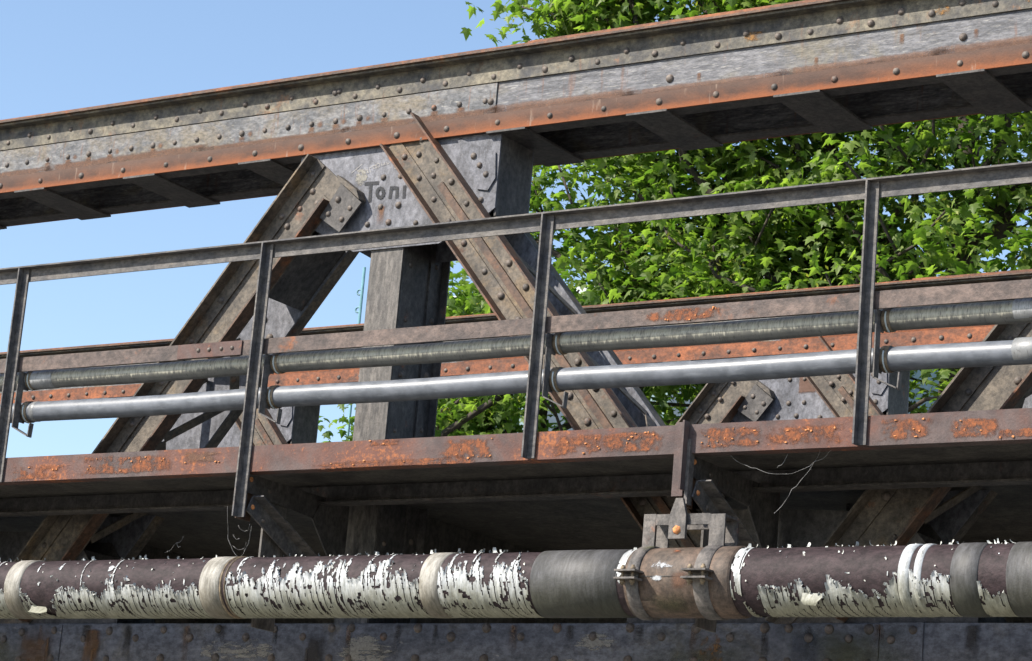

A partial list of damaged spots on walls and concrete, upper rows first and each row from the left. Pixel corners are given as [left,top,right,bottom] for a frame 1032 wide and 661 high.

rust [0,29,1032,194]
rust [555,431,661,456]
rust [701,424,840,448]
rust [882,418,929,440]
rust [954,418,1032,439]
rust [84,455,169,474]
peeling [0,555,216,619]
peeling [225,547,545,618]
peeling [730,541,963,618]
peeling [976,581,1019,617]